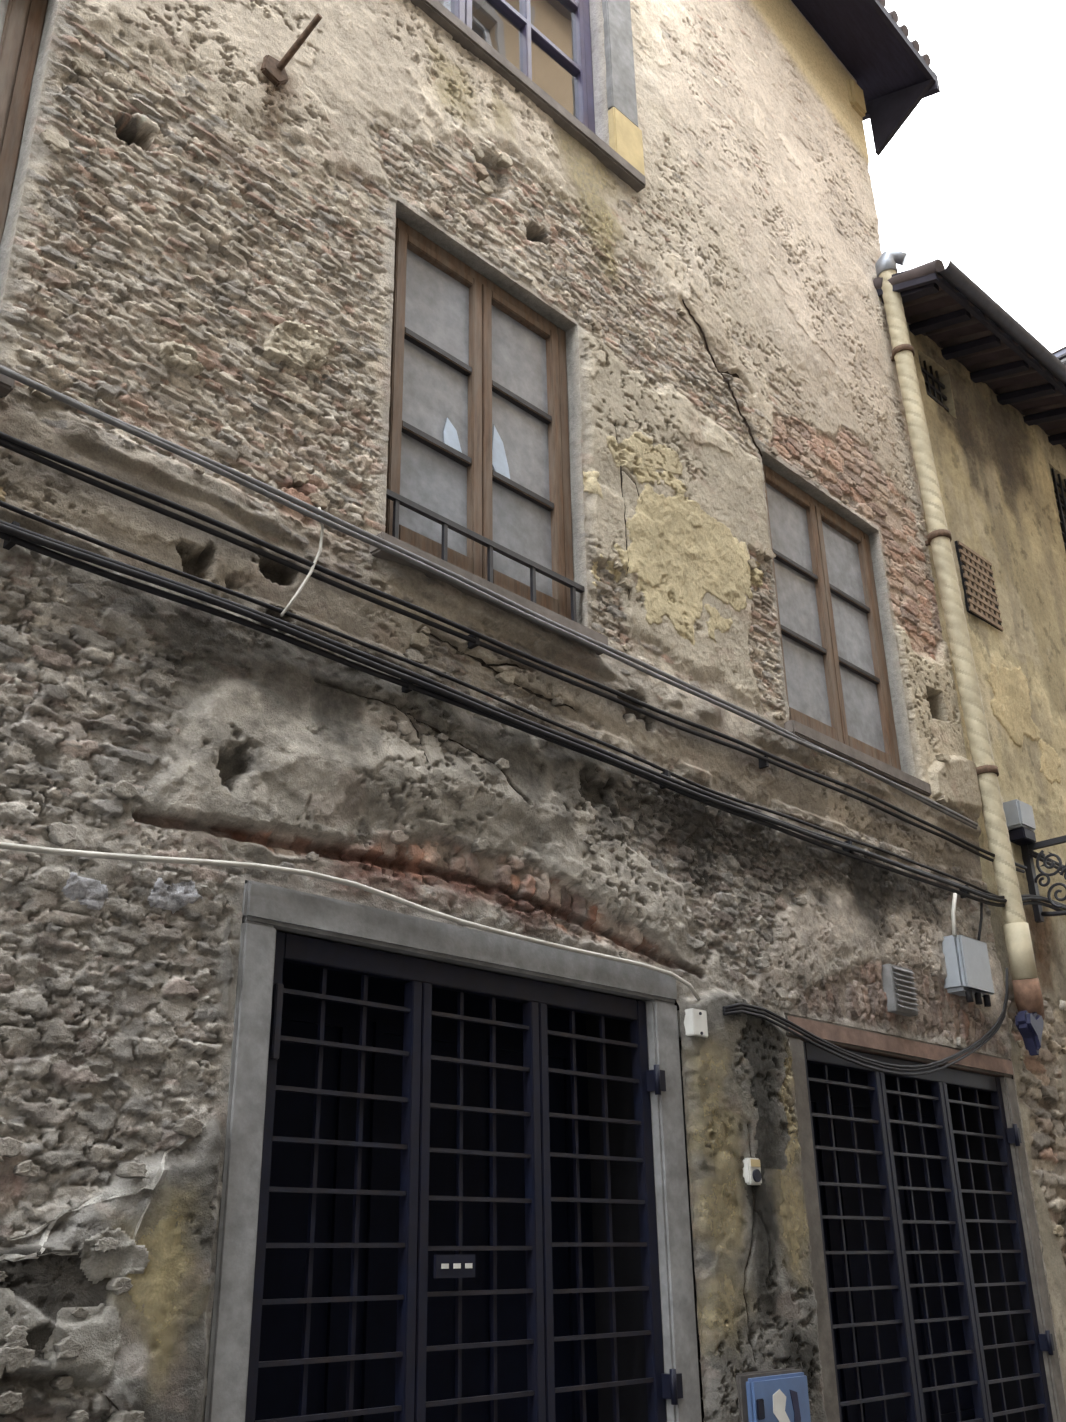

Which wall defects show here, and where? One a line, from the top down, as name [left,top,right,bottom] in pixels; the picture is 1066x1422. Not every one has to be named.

crack [682,299,762,457]
flaking render [583,471,604,499]
flaking render [589,432,788,720]
flaking render [768,410,943,662]
flaking render [0,1137,41,1217]
flaking render [0,1227,150,1393]